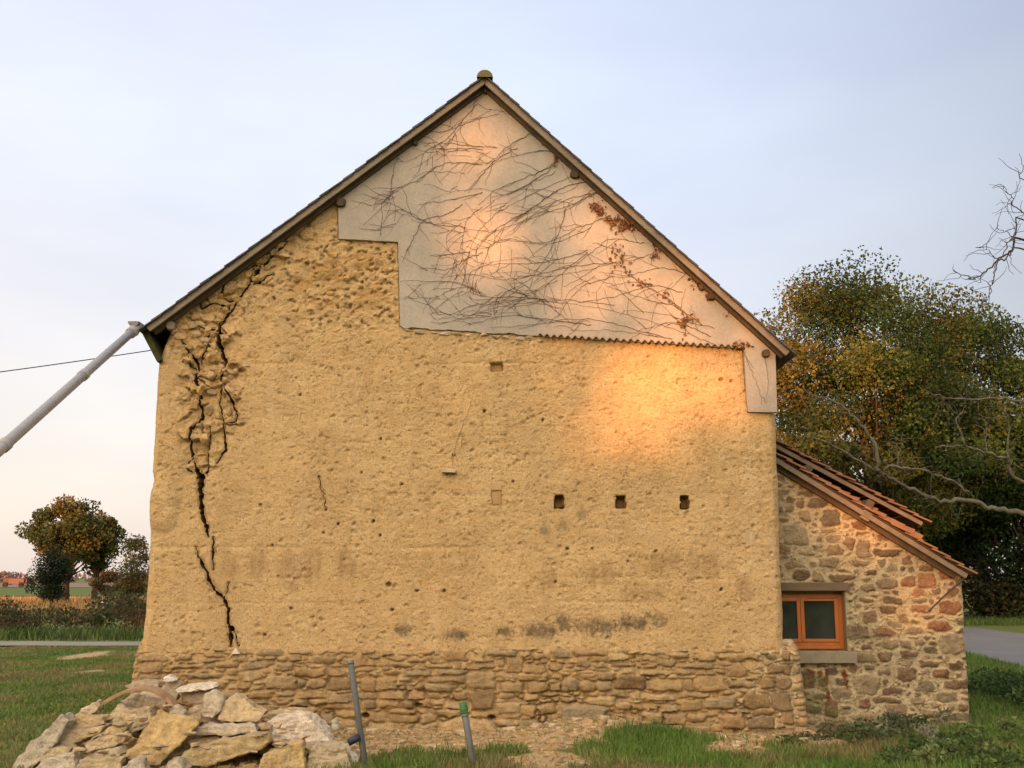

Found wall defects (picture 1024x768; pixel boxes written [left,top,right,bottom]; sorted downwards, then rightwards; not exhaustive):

crack [181,242,287,647]
crack [317,477,327,510]
leakage [528,616,663,635]